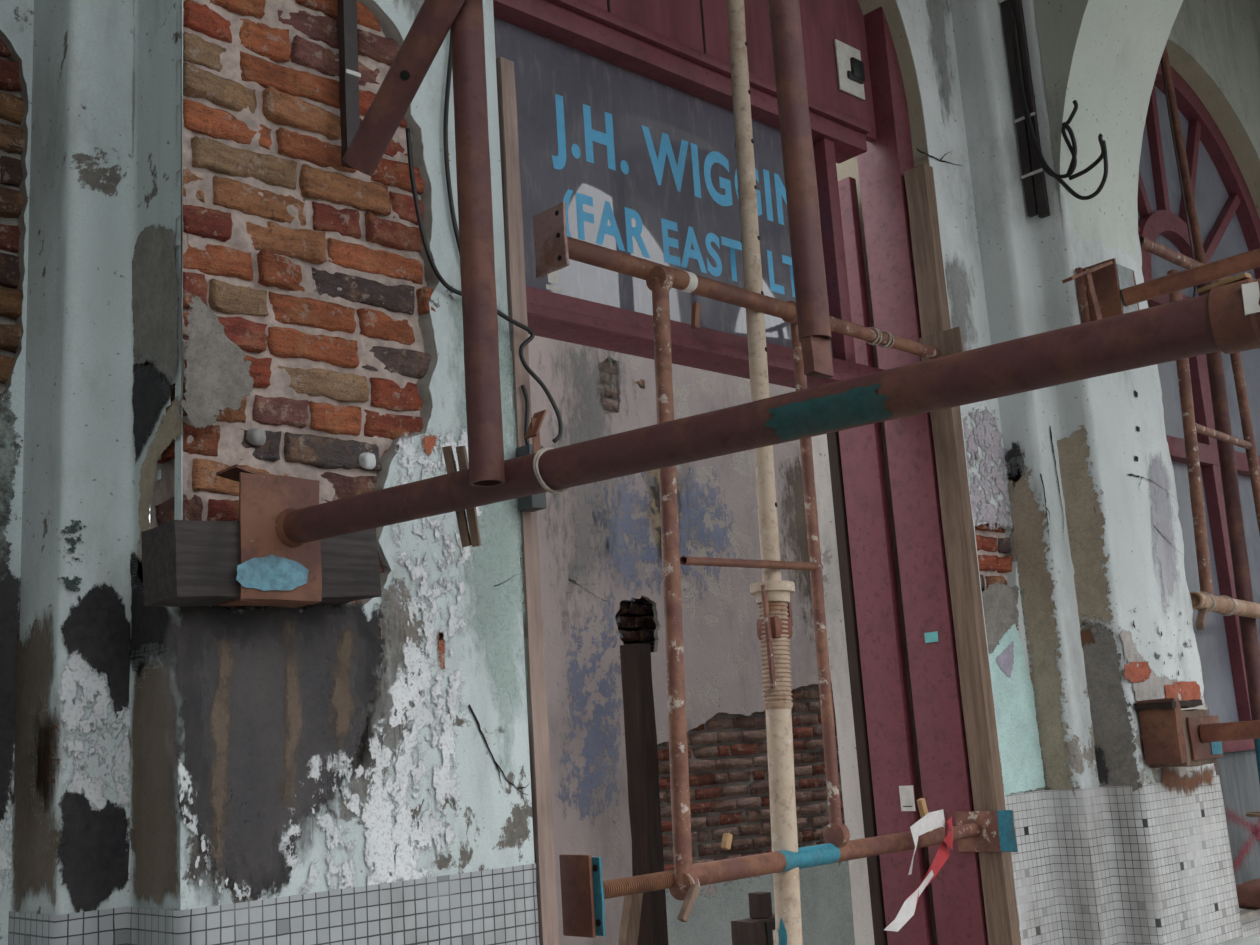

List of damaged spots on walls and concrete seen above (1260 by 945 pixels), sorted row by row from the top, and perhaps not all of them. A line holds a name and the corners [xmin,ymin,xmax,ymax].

peeling [0,39,25,581]
spalling [132,0,469,583]
peeling [58,651,130,811]
leakage [0,550,391,913]
peeling [279,507,482,894]
spalling [657,741,674,871]
peeling [665,874,775,945]
spalling [687,705,772,864]
spalling [791,683,845,848]
peeling [799,861,855,945]
flaking render [962,405,1075,796]
flaking render [1057,425,1210,793]